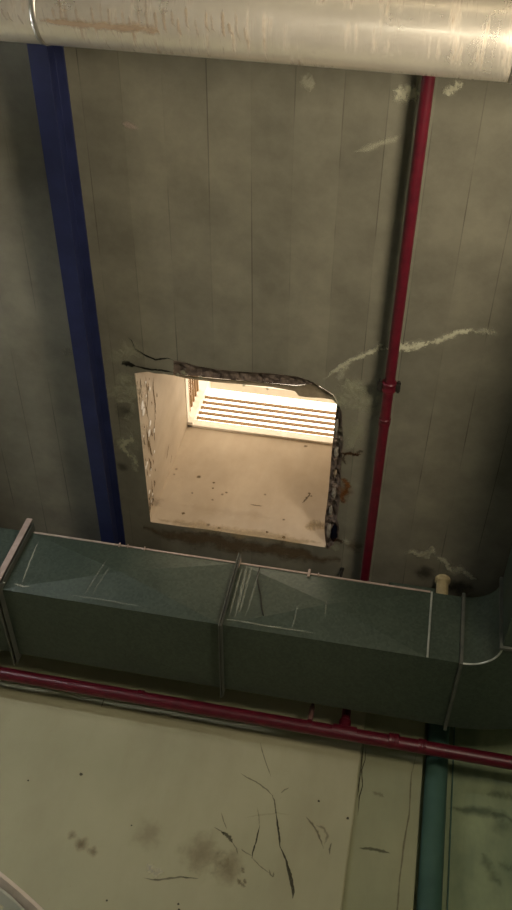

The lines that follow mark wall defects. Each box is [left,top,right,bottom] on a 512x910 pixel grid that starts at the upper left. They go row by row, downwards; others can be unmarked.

crack [122,339,172,372]
crack [328,329,488,377]
crack [221,748,295,897]